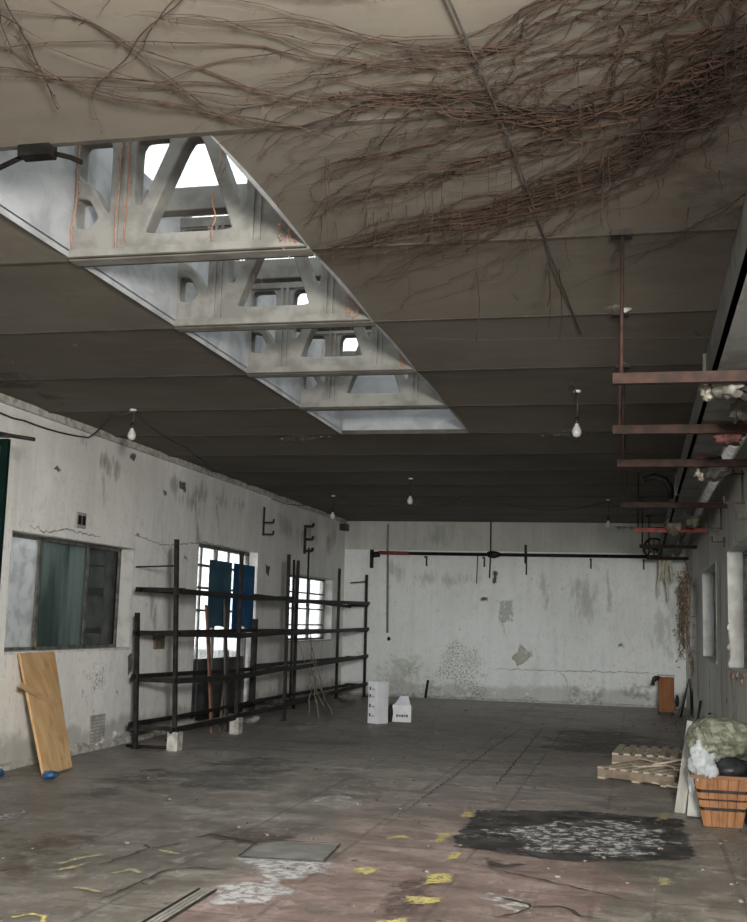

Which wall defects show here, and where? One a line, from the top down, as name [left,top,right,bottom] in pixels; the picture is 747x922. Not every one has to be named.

peeling [512,645,533,666]